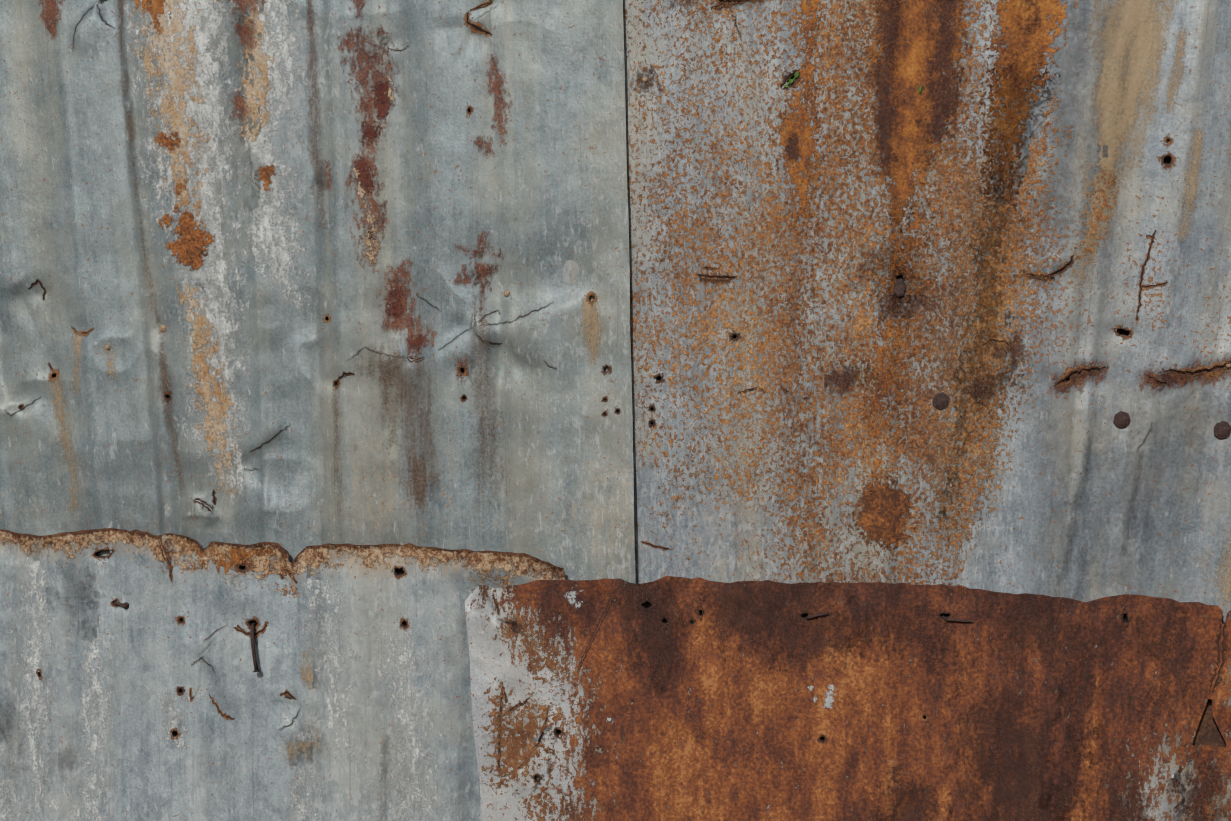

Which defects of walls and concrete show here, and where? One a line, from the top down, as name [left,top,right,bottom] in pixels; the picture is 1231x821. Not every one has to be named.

rust [623,0,674,38]
rust [976,14,997,41]
rust [474,57,507,155]
rust [325,0,437,502]
rust [1050,362,1107,393]
rust [1140,357,1230,394]
rust [470,585,496,609]
rust [478,677,574,796]
rust [560,733,579,763]
rust [517,771,553,821]